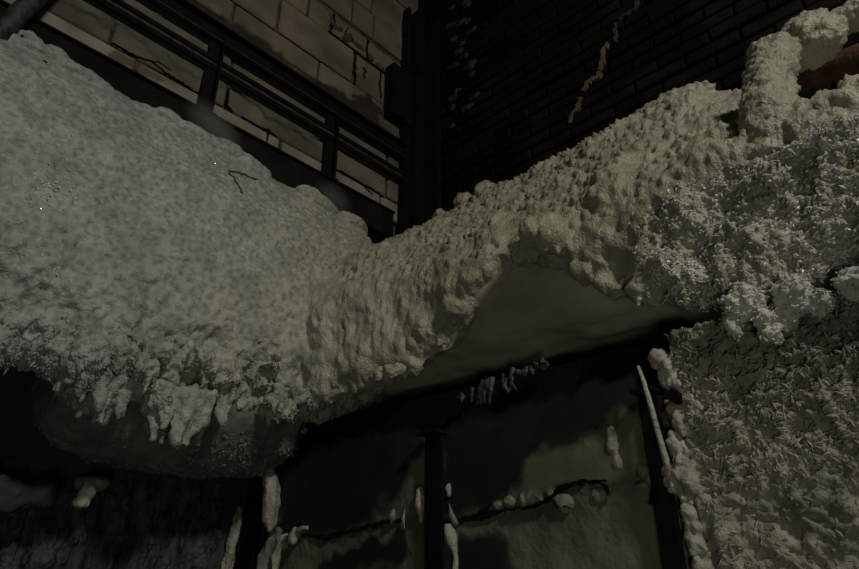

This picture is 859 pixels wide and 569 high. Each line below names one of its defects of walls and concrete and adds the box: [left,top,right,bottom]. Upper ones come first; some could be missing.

crack [328,12,386,99]
crack [568,0,640,124]
crack [301,517,402,541]
crack [446,479,611,525]